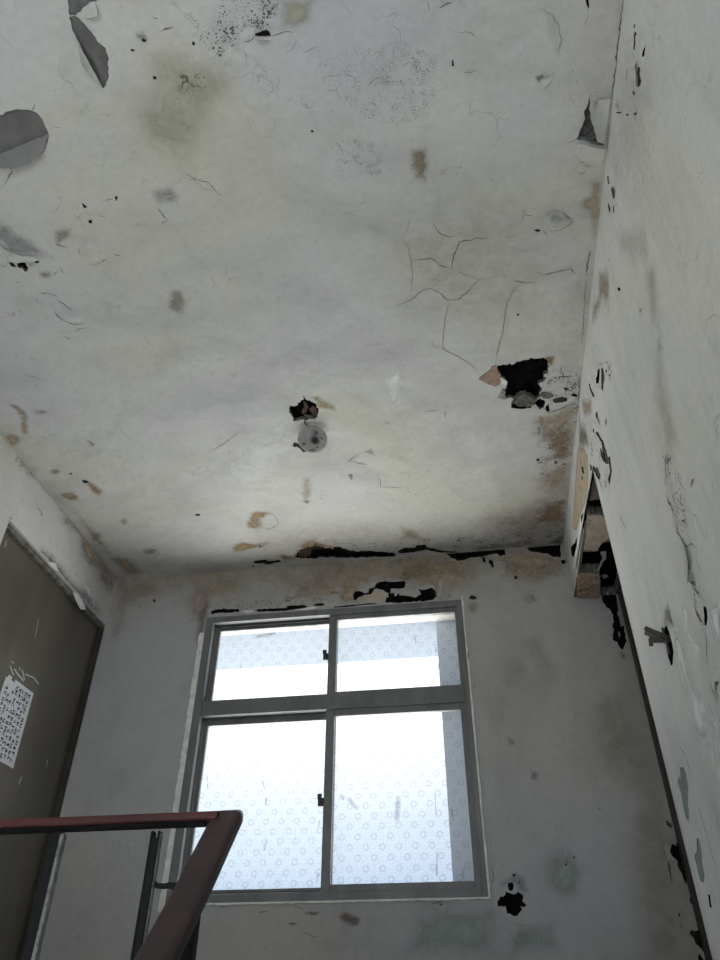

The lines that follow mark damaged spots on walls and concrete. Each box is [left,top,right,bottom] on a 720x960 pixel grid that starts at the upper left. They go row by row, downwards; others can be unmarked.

peeling [68,0,109,89]
crack [611,4,623,98]
spalling [568,24,646,174]
peeling [0,105,61,182]
crack [398,221,590,369]
spalling [289,396,332,421]
spalling [479,357,579,414]
spalling [589,363,610,397]
leakage [370,367,609,599]
spalling [252,543,506,568]
spalling [602,594,626,655]
spalling [497,874,526,916]